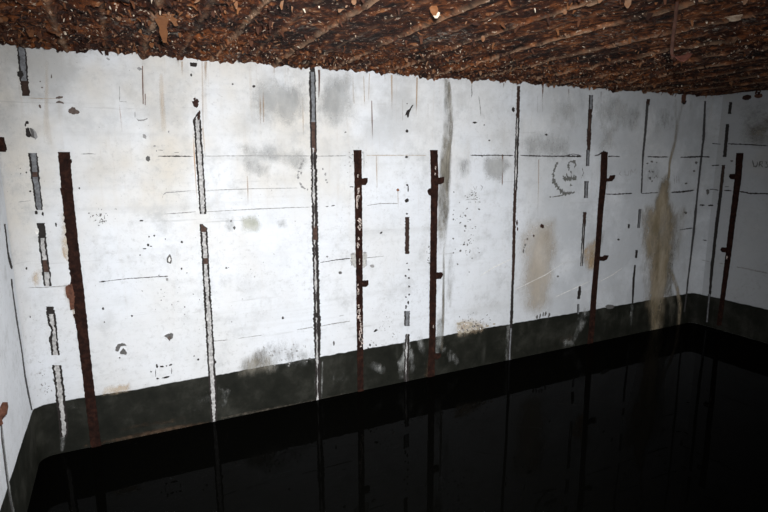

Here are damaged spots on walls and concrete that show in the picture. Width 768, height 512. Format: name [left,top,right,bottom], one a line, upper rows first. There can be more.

rust [155,14,178,43]
rust [58,152,101,448]
rust [353,150,369,392]
damp [0,142,768,512]
rust [427,150,444,377]
damp [439,84,453,230]
rust [585,152,615,344]
rust [717,153,744,326]